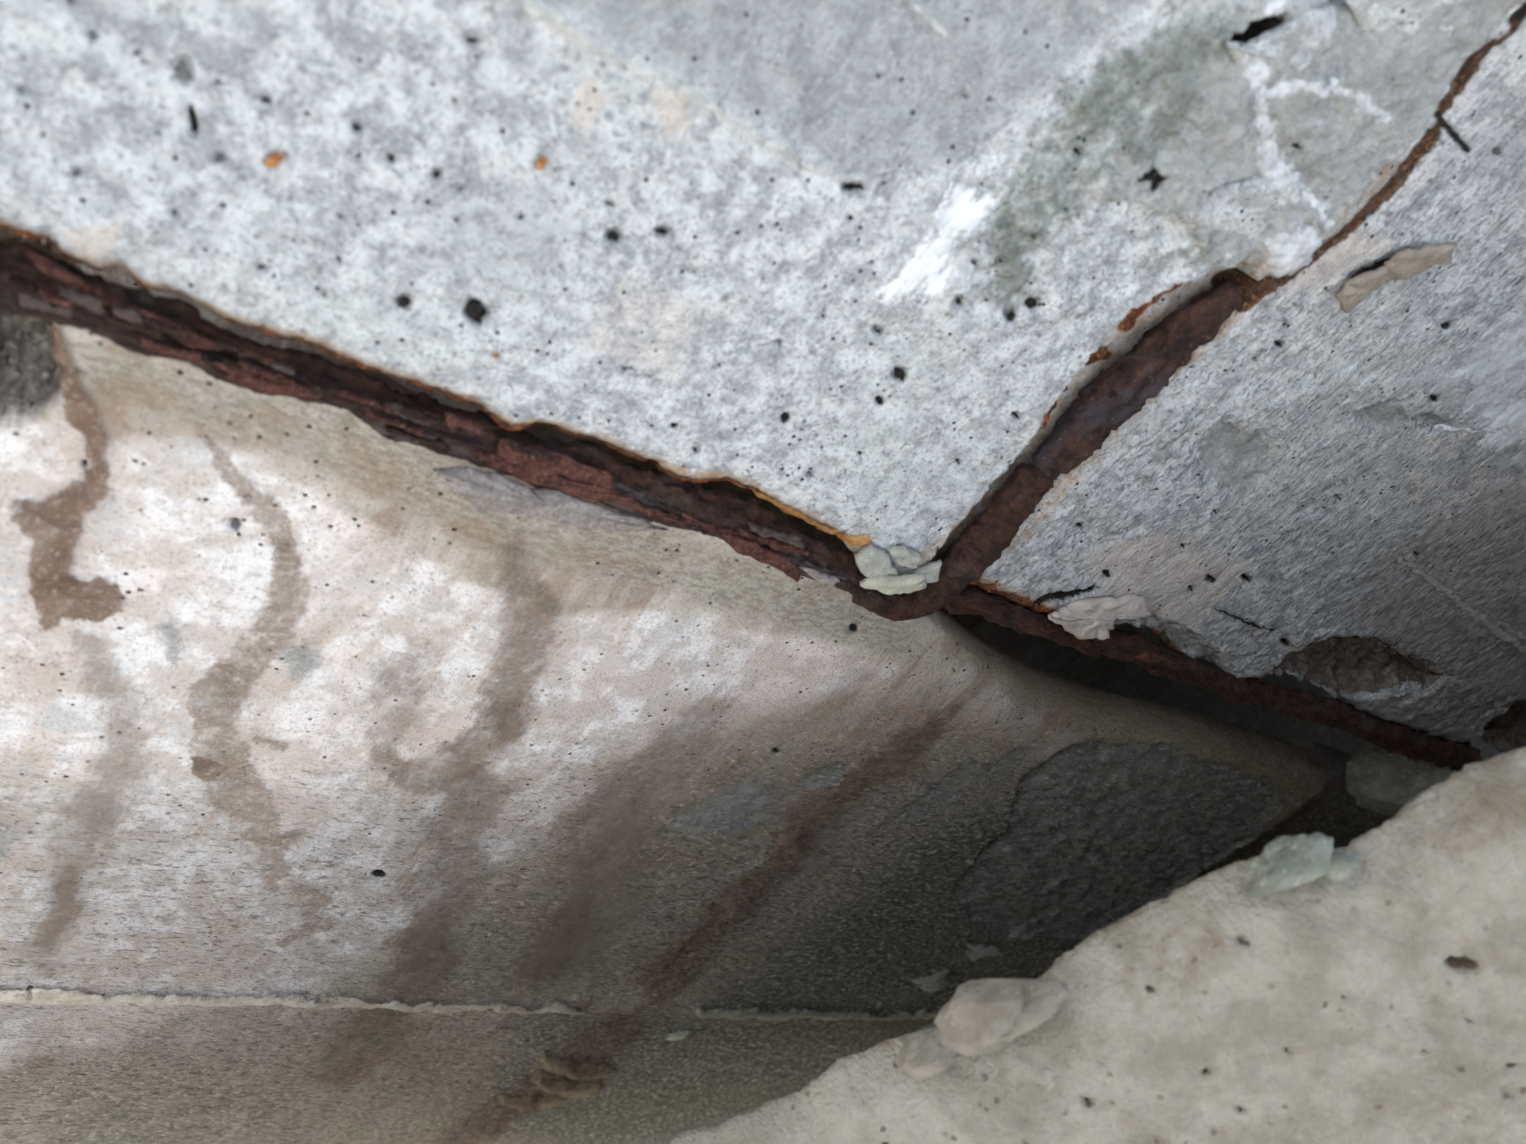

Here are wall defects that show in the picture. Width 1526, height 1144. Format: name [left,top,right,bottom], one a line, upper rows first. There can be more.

corrosion [263,152,286,168]
crack [1211,2,1526,313]
corrosion [1118,284,1182,332]
corrosion [1085,346,1112,366]
corrosion [0,226,876,630]
crack [1036,586,1093,604]
crack [1215,608,1274,632]
corrosion [187,423,332,946]
corrosion [946,580,1483,772]
spalling [1275,636,1442,694]
spalling [1478,699,1526,753]
water stain [319,546,556,1082]